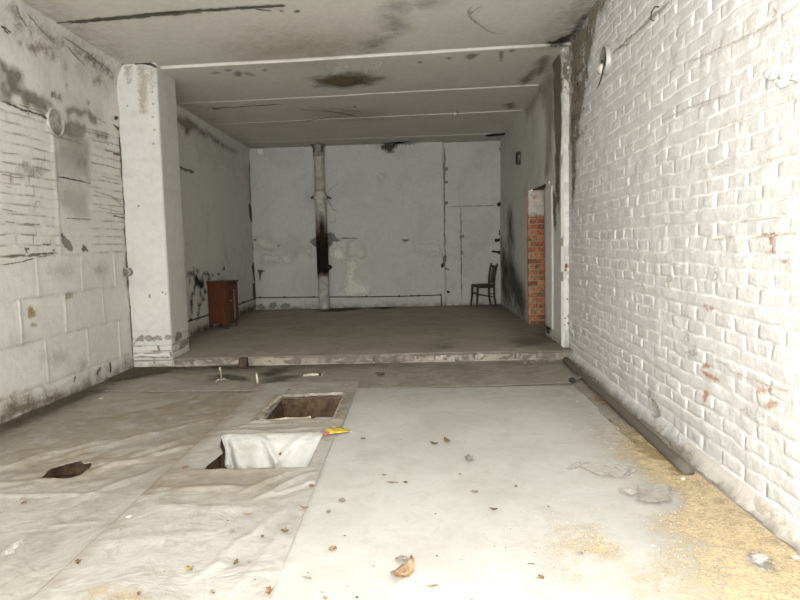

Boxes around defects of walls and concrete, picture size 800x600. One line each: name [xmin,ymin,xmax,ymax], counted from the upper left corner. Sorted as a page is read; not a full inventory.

water stain [523,0,608,230]
water stain [188,266,225,316]
water stain [316,222,329,276]
peeling [328,232,369,295]
water stain [502,215,525,312]